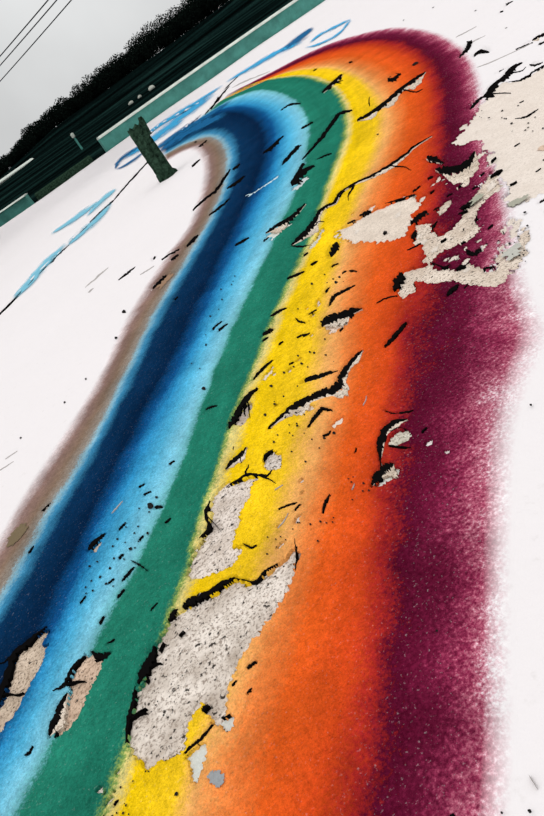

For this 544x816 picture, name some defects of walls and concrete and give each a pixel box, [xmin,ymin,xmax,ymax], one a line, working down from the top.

crack [457,26,544,119]
spalling [292,136,432,249]
peeling [334,68,544,299]
crack [85,235,199,293]
spalling [323,309,363,340]
crack [125,71,517,744]
peeling [362,420,412,492]
peeling [189,479,258,580]
peeling [0,632,48,732]
peeling [50,655,103,736]
crack [184,704,233,754]
peeling [130,552,301,783]